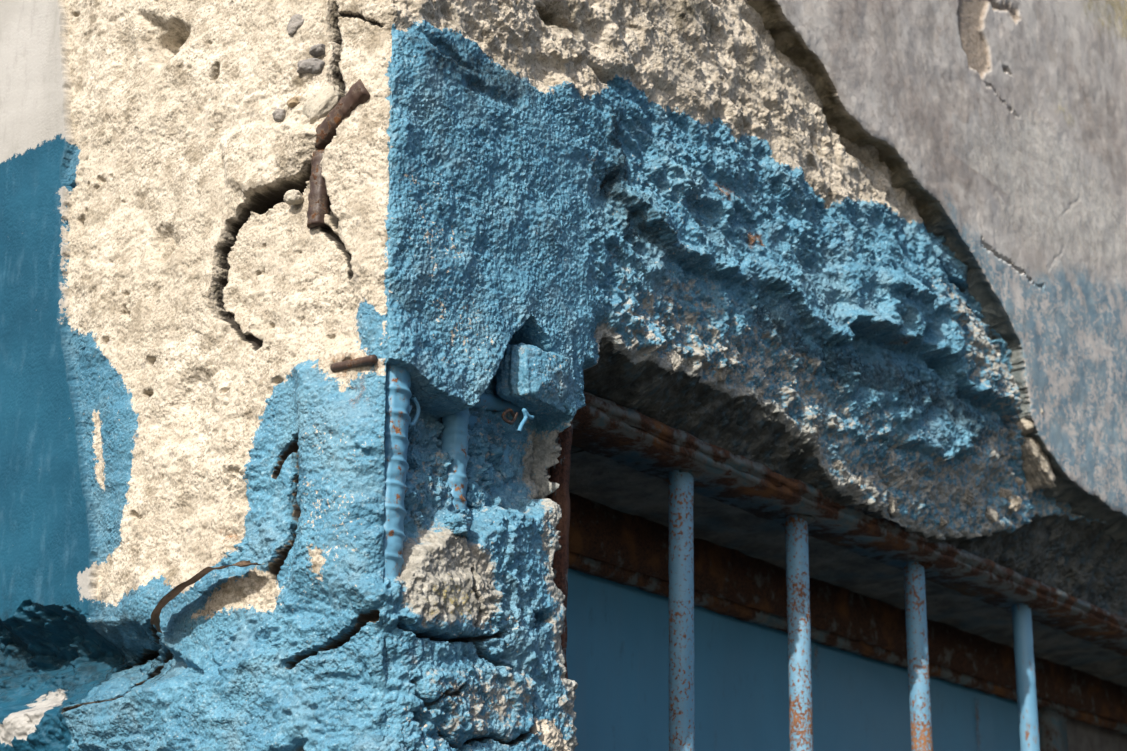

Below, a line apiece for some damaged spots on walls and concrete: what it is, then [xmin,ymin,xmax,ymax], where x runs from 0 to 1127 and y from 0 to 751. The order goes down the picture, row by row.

spalling [0,0,573,751]
crack [208,0,385,350]
spalling [392,0,1127,543]
crack [279,565,540,751]